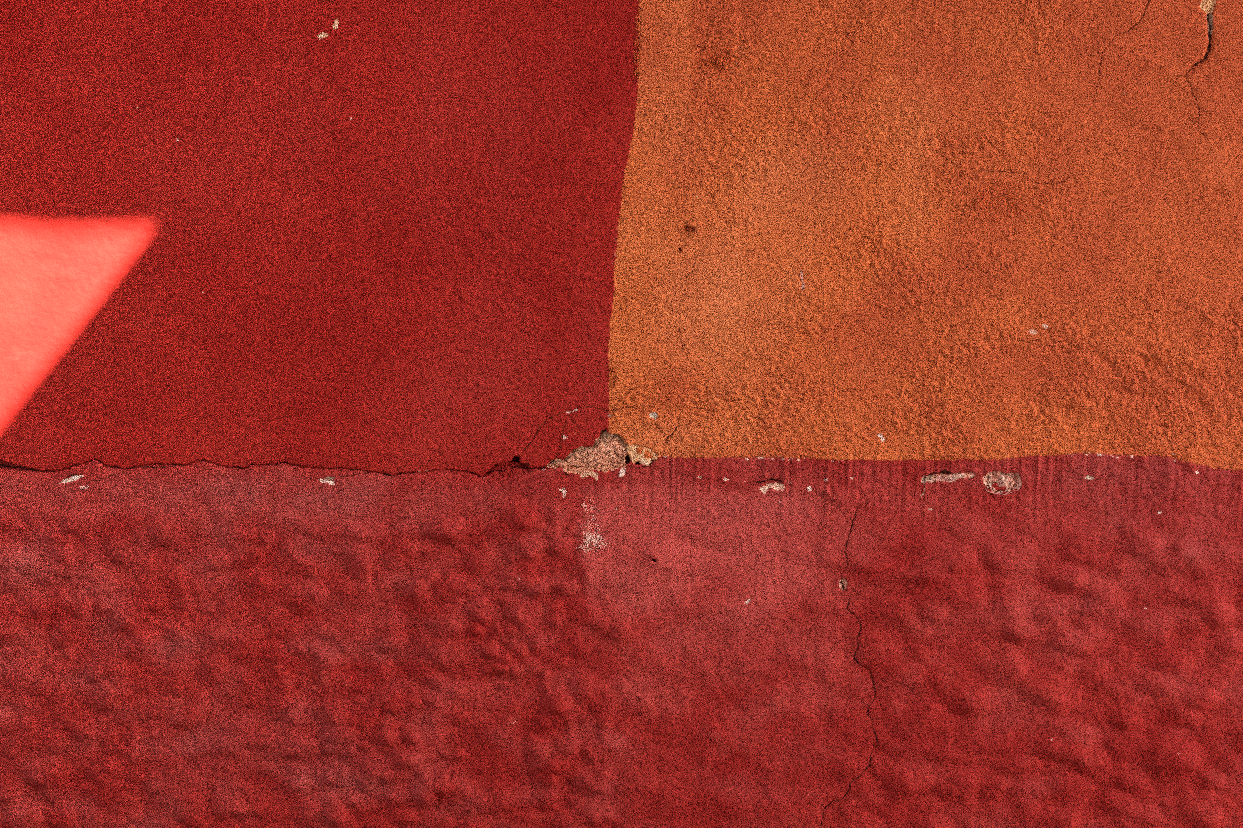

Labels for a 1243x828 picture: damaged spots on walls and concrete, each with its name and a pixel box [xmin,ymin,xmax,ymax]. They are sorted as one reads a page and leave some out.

crack [1093,0,1150,99]
flaking render [1175,0,1227,139]
crack [0,387,678,483]
flaking render [540,414,658,497]
spalling [758,478,785,494]
flaking render [921,469,1022,510]
crack [821,510,878,827]